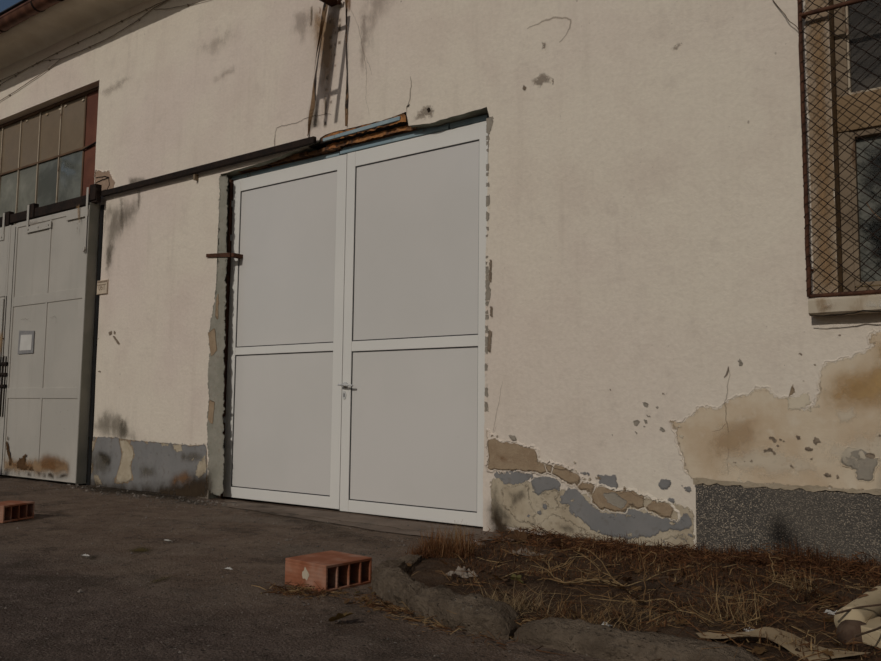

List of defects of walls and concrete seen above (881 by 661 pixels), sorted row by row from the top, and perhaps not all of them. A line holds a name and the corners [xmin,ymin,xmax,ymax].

spalling [486,117,494,152]
peeling [82,175,228,496]
spalling [485,256,493,371]
corrosion [4,437,68,473]
peeling [485,329,881,549]